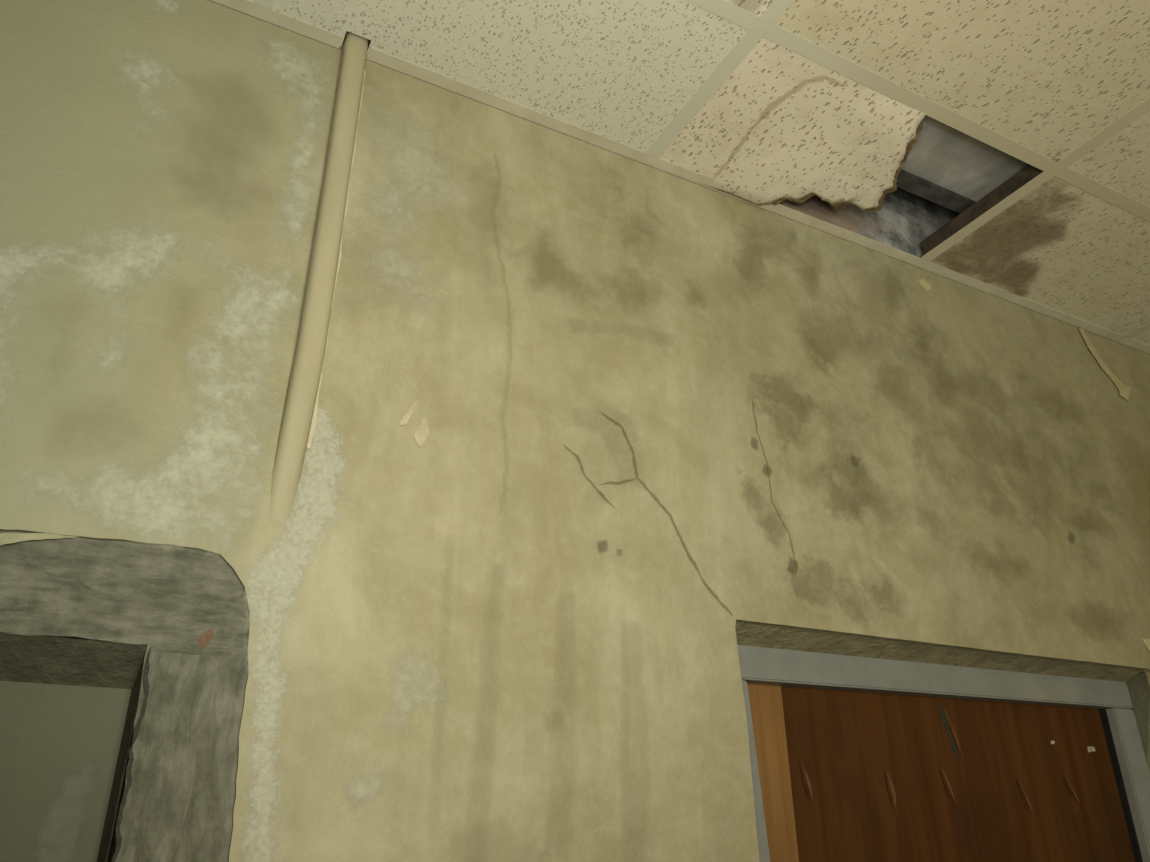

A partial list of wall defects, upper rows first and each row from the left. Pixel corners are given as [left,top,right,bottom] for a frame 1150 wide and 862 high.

water stain [269,42,319,230]
water stain [0,249,72,295]
water stain [79,231,174,290]
water stain [937,183,1065,296]
water stain [91,267,296,539]
flaking render [0,531,249,862]
water stain [243,408,345,862]